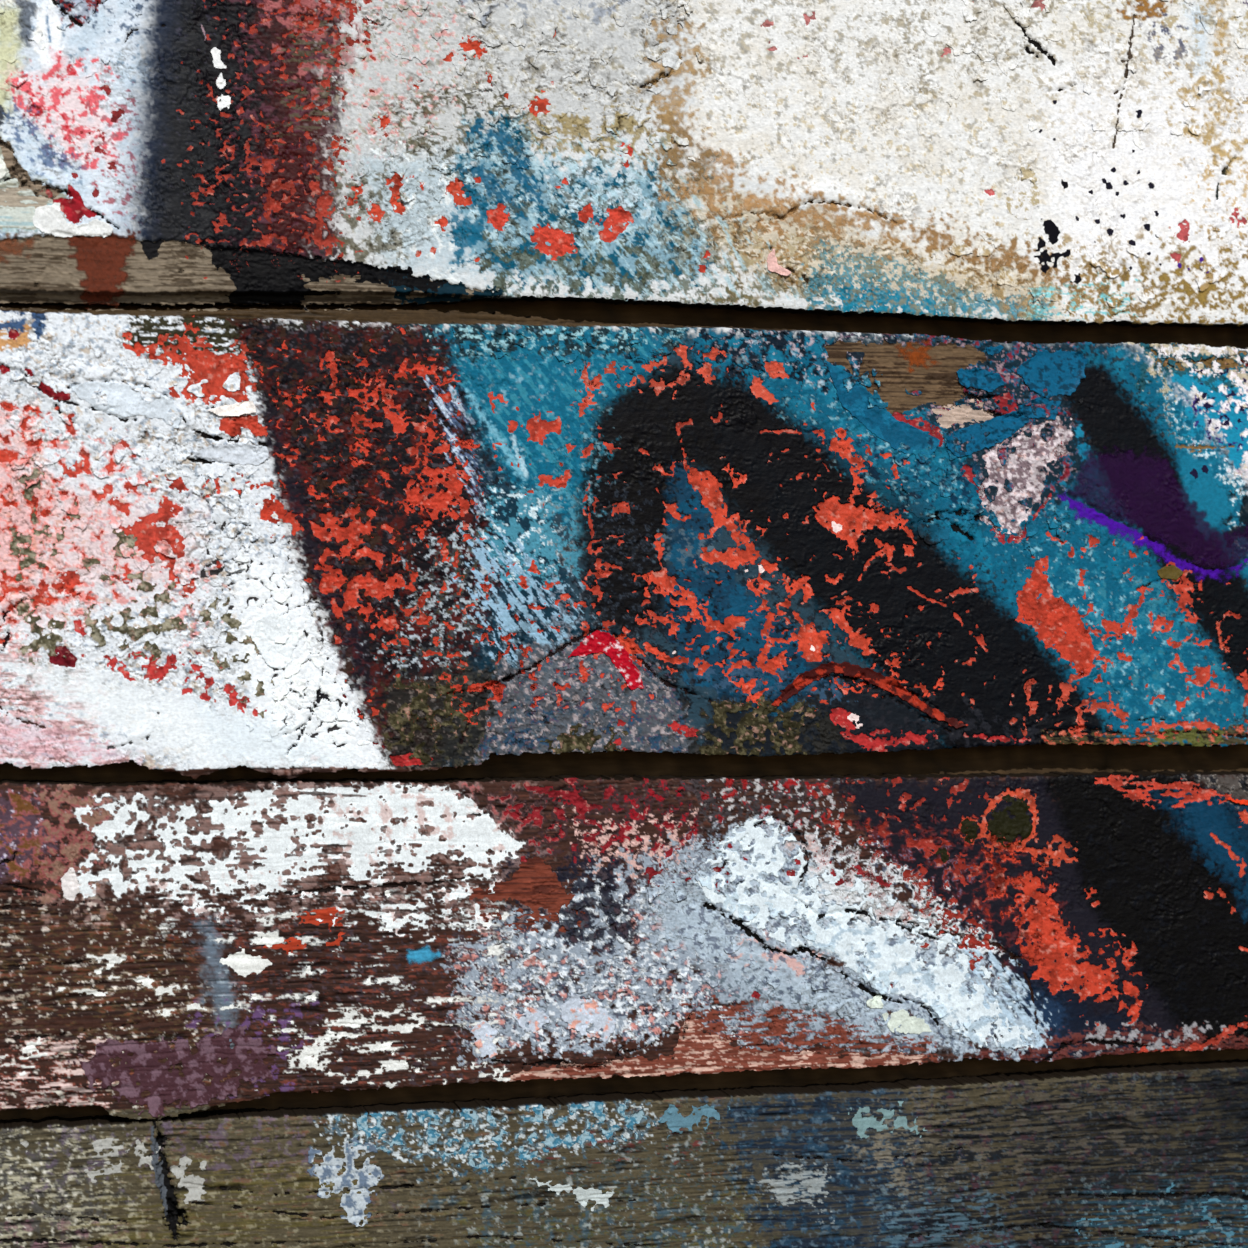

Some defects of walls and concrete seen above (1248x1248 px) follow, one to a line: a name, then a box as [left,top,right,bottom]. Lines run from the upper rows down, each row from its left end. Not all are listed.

peeling [57,0,83,30]
peeling [2,50,28,87]
peeling [84,55,111,96]
peeling [0,158,9,179]
peeling [80,108,125,170]
peeling [161,0,700,282]
peeling [32,173,113,238]
crack [722,199,897,283]
peeling [390,753,433,767]
peeling [49,777,1148,1118]
crack [703,816,1148,1061]
peeling [0,1037,48,1076]